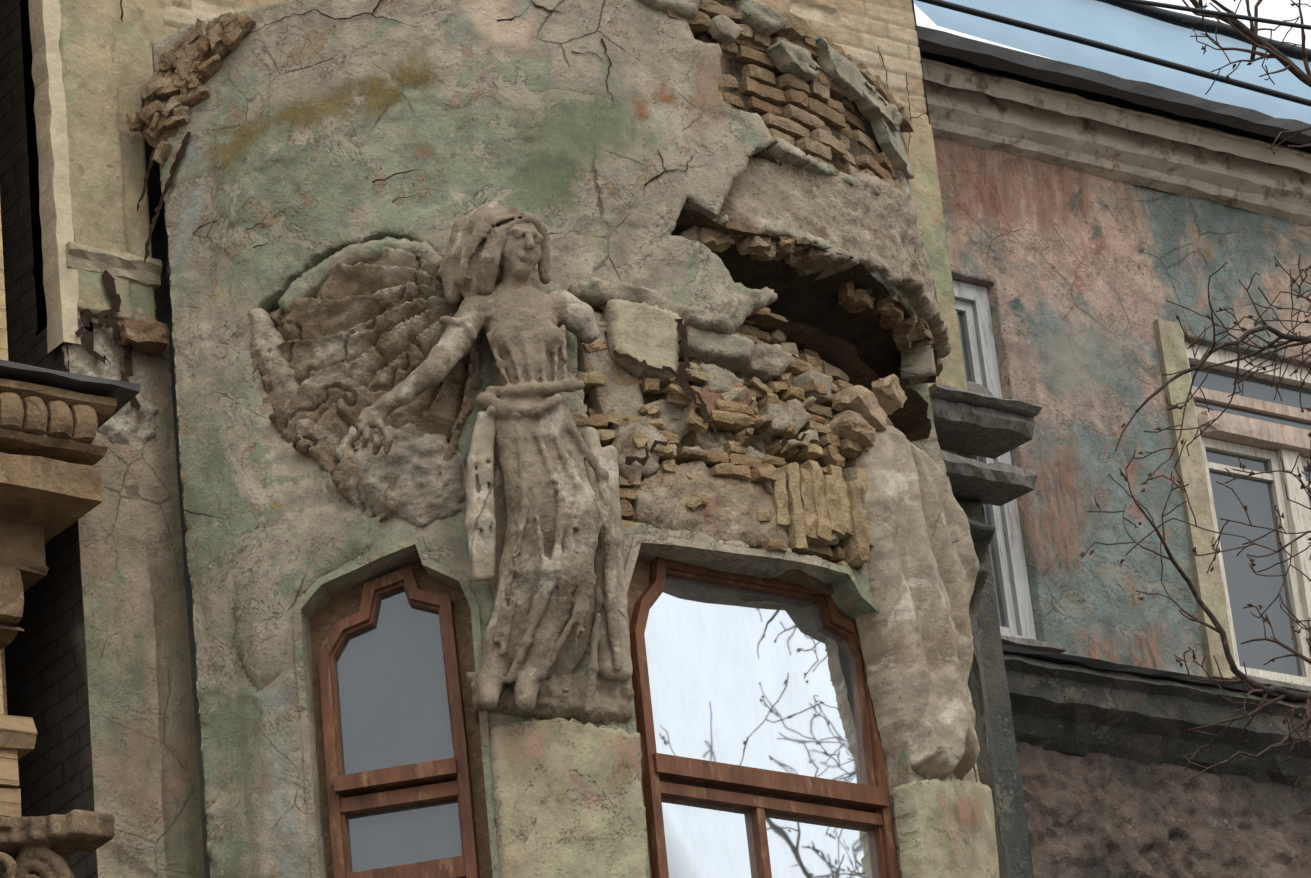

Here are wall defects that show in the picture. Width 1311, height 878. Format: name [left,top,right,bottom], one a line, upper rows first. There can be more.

crack [497,0,563,21]
flaking render [126,12,256,166]
crack [571,38,615,105]
spalling [637,0,914,190]
crack [372,169,420,203]
crack [644,150,694,186]
spalling [568,210,943,442]